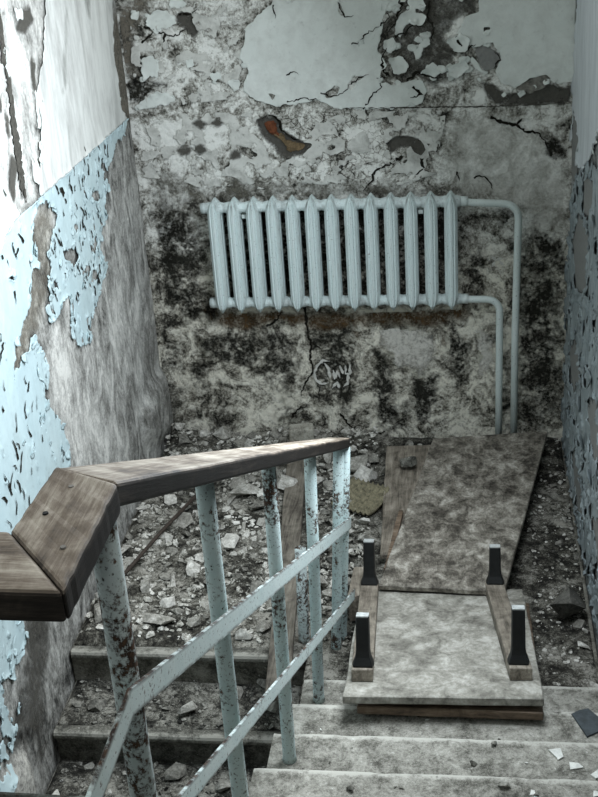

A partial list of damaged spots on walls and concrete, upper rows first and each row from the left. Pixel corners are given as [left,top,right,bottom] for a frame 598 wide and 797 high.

crack [351,12,390,44]
crack [287,74,571,150]
peeling [0,0,239,534]
leakage [148,174,286,320]
leakage [281,211,290,295]
leakage [319,210,329,296]
leakage [339,210,348,296]
leakage [358,209,367,295]
leakage [378,208,386,294]
leakage [418,211,426,294]
peeling [138,0,598,644]
peeling [0,620,29,792]